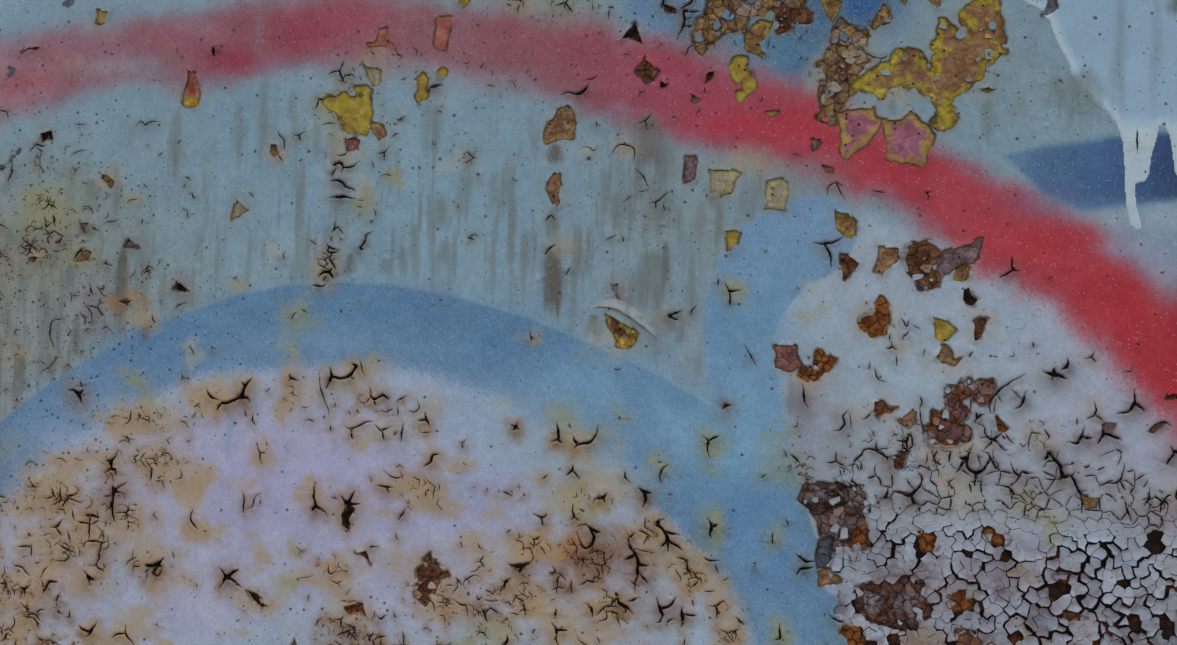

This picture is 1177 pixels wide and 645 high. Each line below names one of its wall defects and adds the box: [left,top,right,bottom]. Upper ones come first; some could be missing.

corrosion [28,124,60,154]
crack [277,47,528,318]
crack [506,0,632,95]
corrosion [567,104,669,168]
peeling [687,0,1008,174]
crack [0,121,748,645]
corrosion [0,158,1130,645]
peeling [797,476,932,645]
peeling [835,237,987,366]
peeling [868,377,1009,452]
crack [754,342,1177,645]
corrosion [1130,471,1177,535]